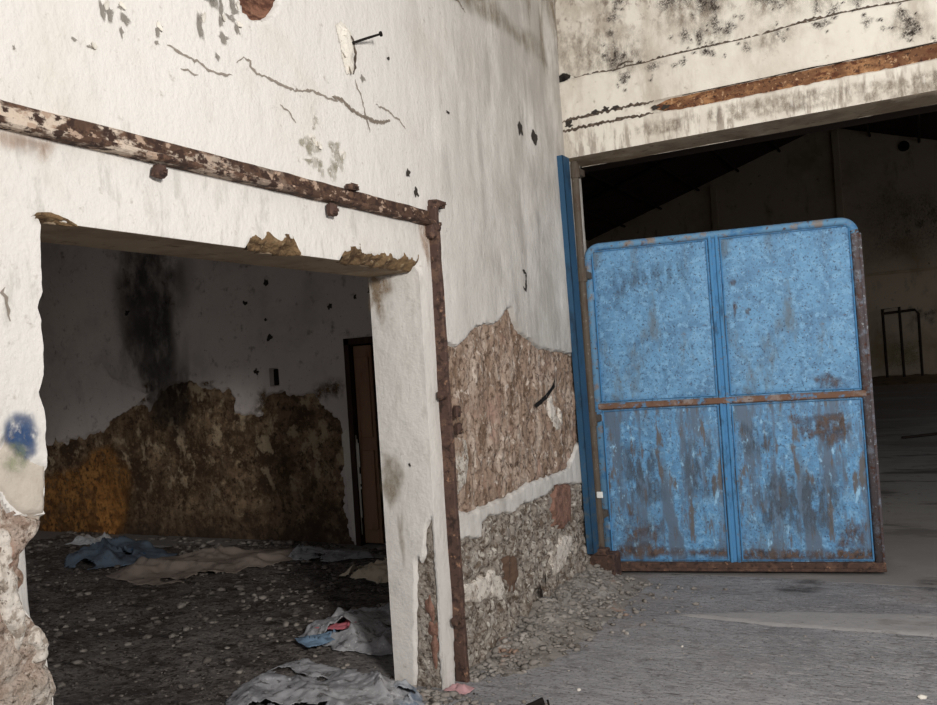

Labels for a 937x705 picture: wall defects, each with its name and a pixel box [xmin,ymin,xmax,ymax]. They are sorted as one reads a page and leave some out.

peeling [197,0,275,44]
crack [168,45,405,129]
leakage [577,40,656,91]
leakage [662,0,743,67]
rust [656,42,937,111]
spalling [244,232,301,256]
spalling [336,244,419,272]
spalling [448,309,578,512]
spalling [0,363,363,705]
spalling [417,520,442,689]
spalling [461,483,591,669]